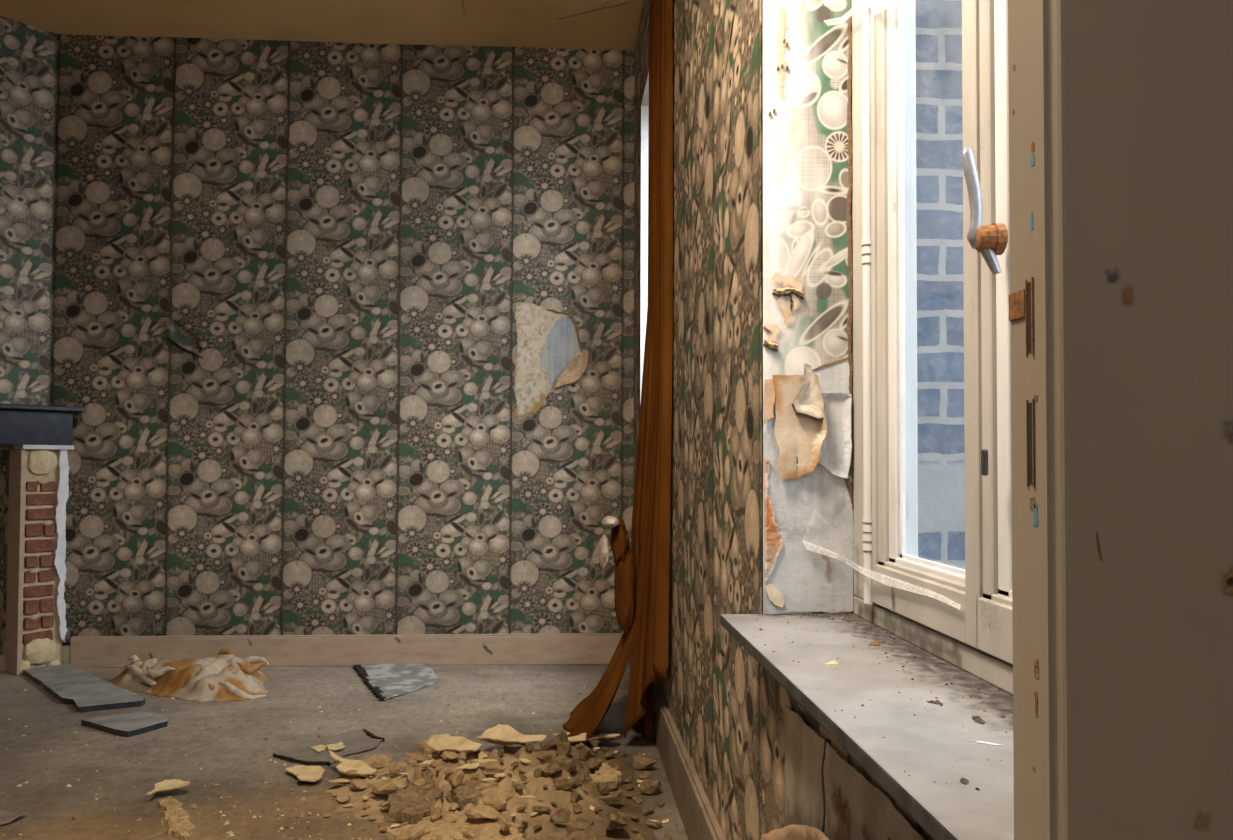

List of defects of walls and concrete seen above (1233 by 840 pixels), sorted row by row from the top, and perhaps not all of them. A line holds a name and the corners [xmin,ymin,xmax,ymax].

flaking render [540,316,580,387]
peeling [764,364,827,608]
spalling [833,790,870,840]